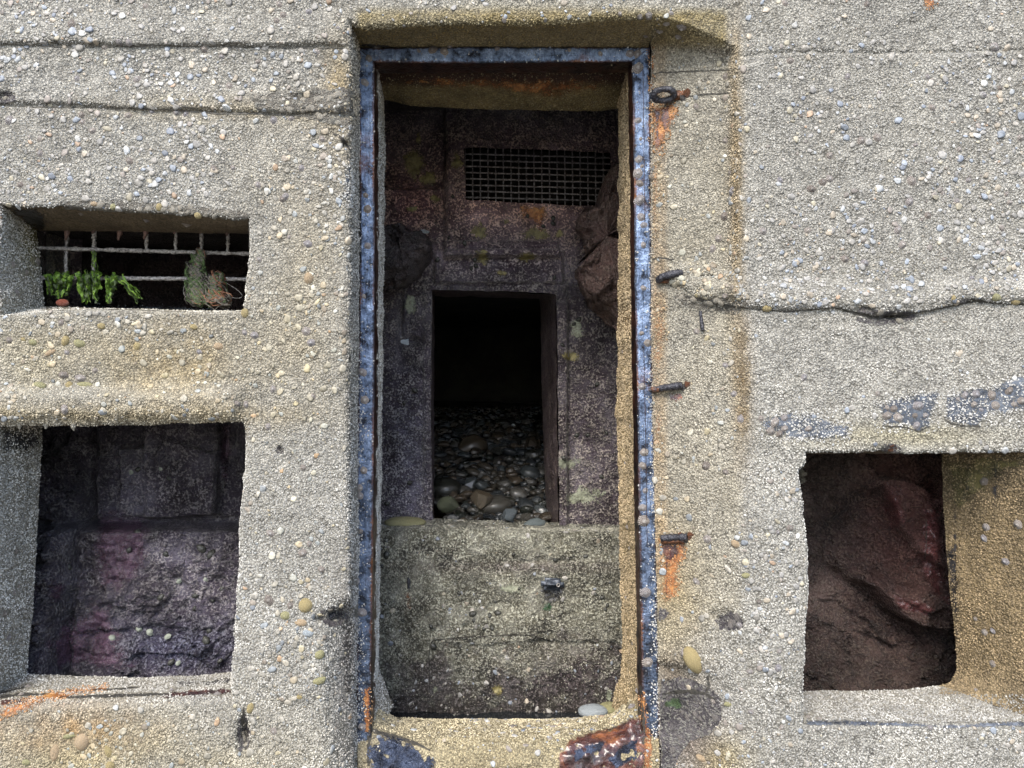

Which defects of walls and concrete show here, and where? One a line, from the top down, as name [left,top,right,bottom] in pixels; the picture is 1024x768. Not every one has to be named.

corrosion [652,88,691,151]
crack [685,295,1024,321]
corrosion [661,531,694,598]
corrosion [1,686,106,717]
corrosion [559,692,652,768]